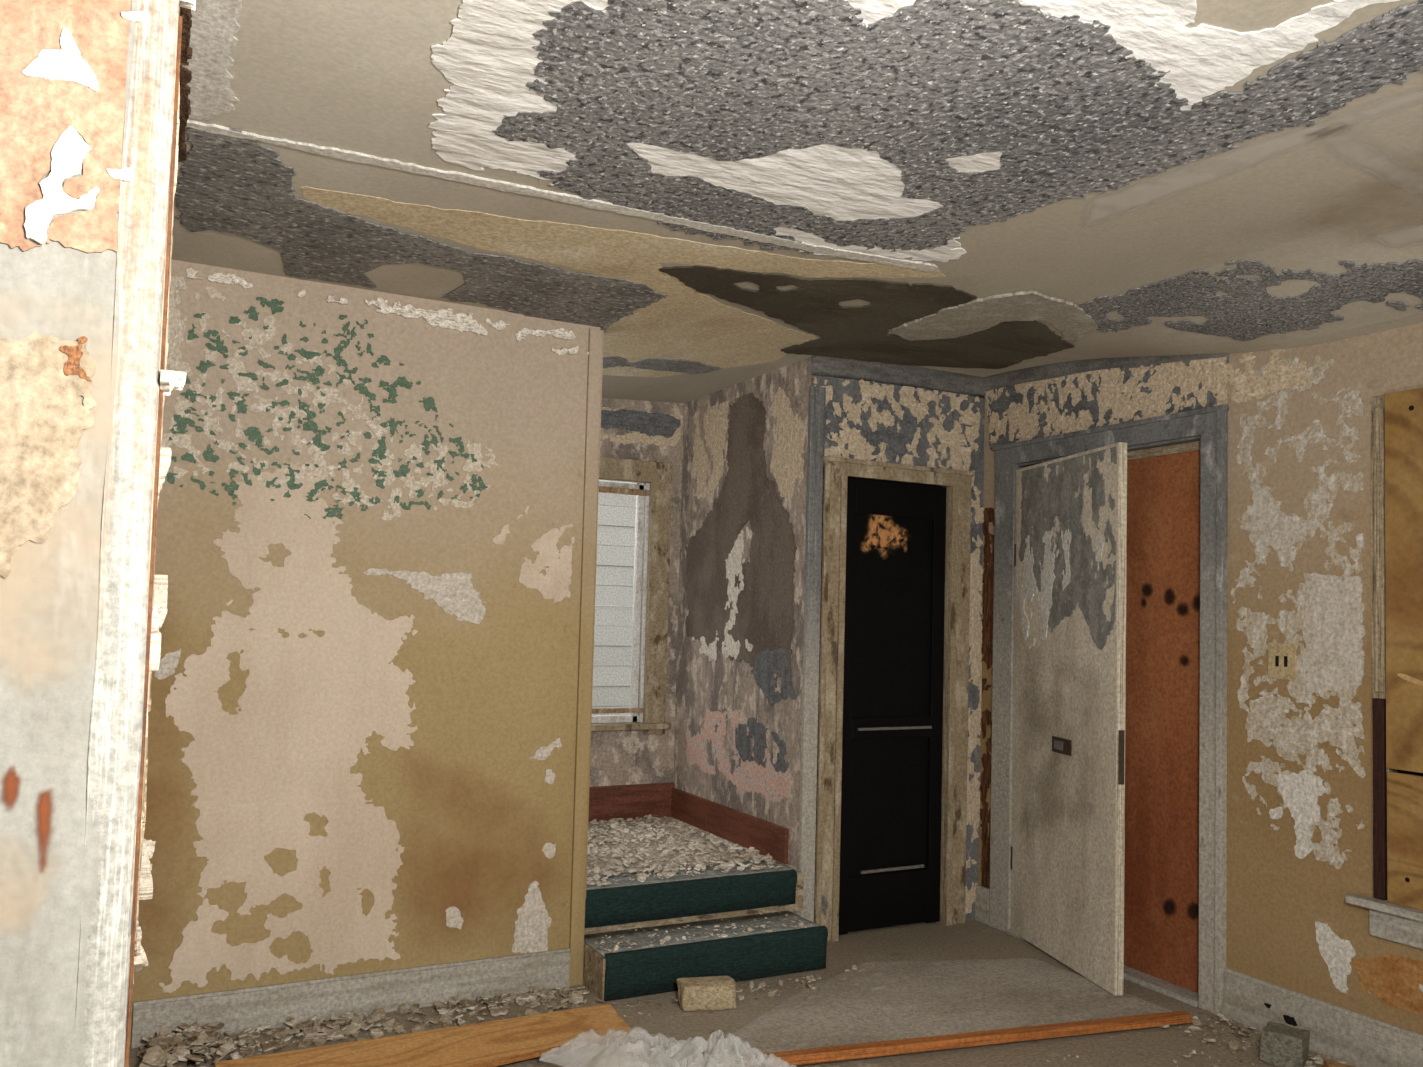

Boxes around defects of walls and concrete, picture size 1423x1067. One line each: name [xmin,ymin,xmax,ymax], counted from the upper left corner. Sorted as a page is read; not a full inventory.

peeling [0,0,144,253]
spalling [492,0,1423,254]
peeling [133,83,722,993]
peeling [600,387,805,706]
spalling [659,259,1423,914]
rust [3,769,20,806]
rust [38,791,52,869]
spalling [1264,1003,1297,1026]
peeling [1315,921,1423,1015]